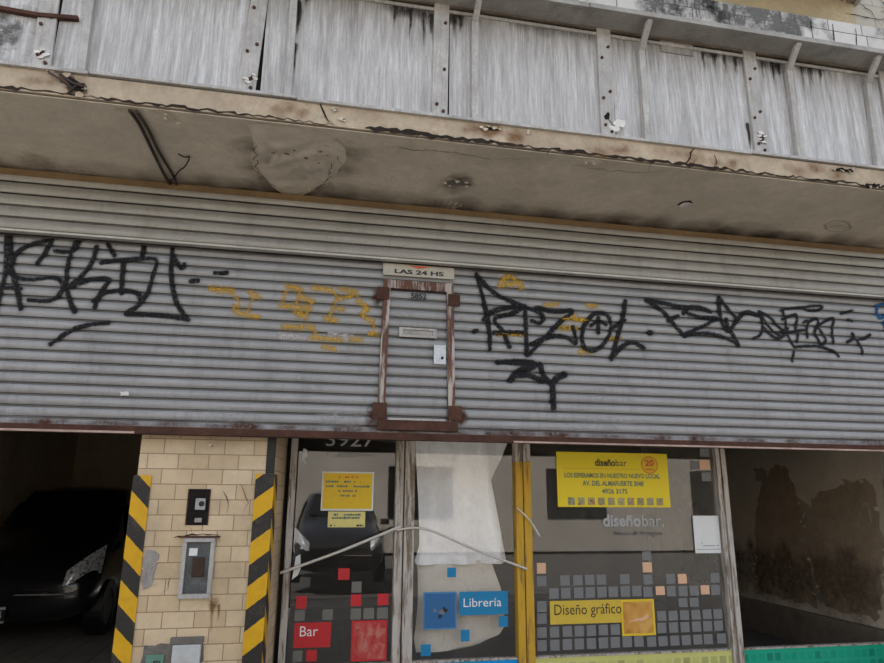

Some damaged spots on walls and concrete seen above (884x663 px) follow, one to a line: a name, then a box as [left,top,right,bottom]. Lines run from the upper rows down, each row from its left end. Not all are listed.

water stain [644,0,813,36]
crack [810,1,884,44]
crack [0,85,334,125]
crack [365,126,876,188]
water stain [703,553,721,582]
water stain [734,541,880,617]